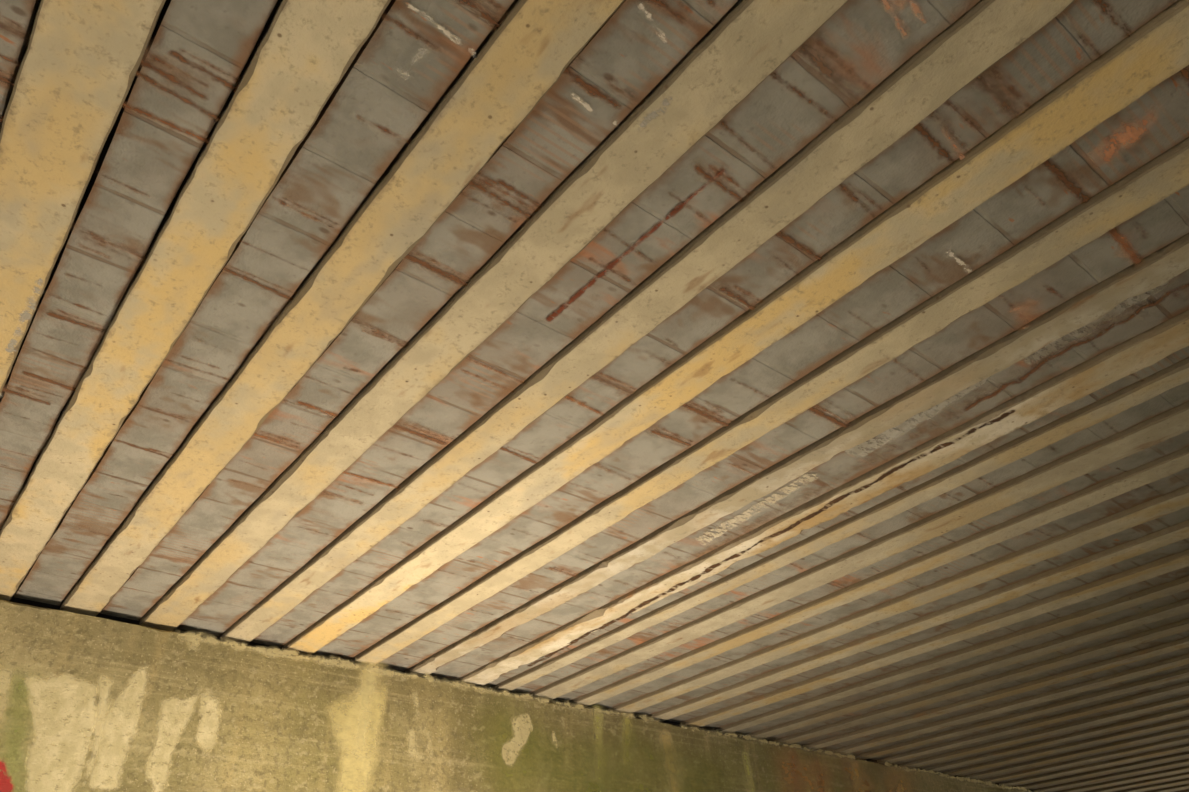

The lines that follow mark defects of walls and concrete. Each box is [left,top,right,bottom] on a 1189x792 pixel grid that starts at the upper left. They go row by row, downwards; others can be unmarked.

rust [1042,160,1090,203]
rust [682,403,729,427]
crack [527,410,1015,667]
peeling [26,670,146,792]
peeling [146,696,221,792]
peeling [502,714,532,765]
spalling [503,691,653,722]